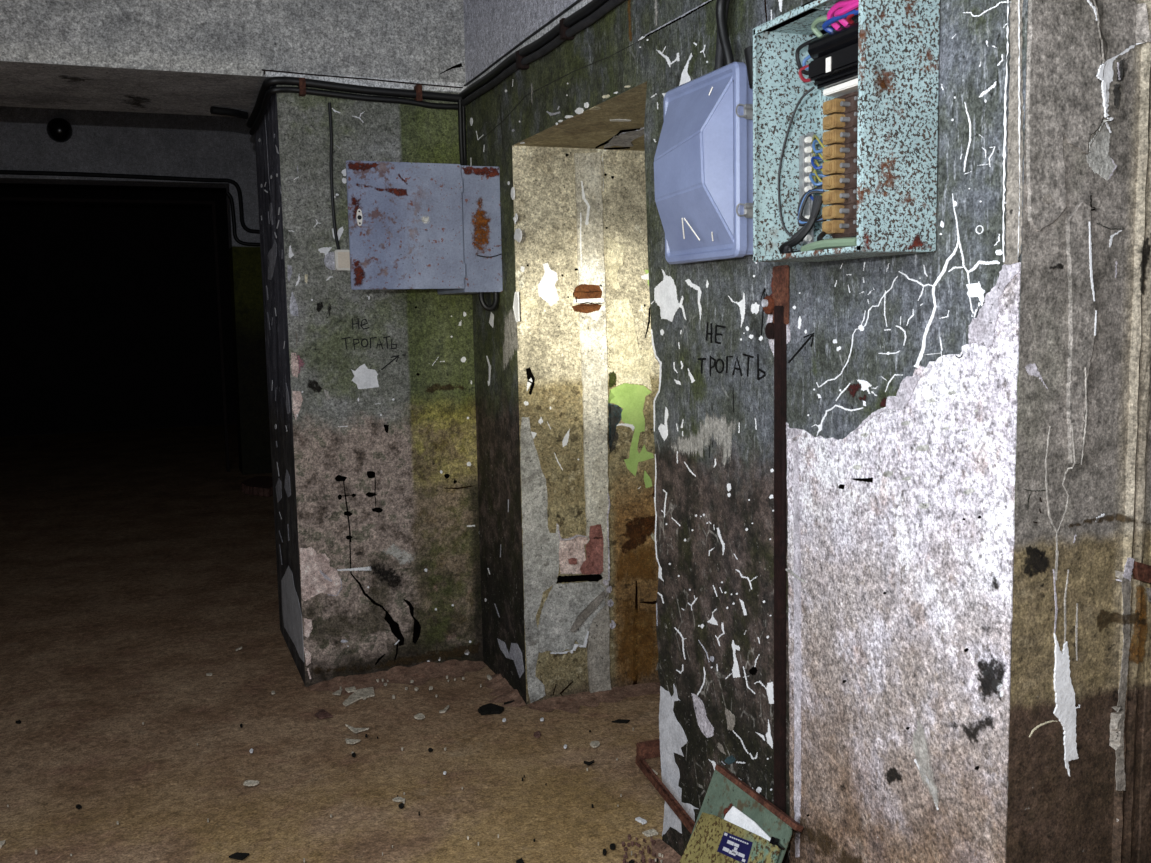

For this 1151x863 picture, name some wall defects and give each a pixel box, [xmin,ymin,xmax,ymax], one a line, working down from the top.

peeling [508,181,522,243]
crack [813,102,1000,436]
crack [335,471,421,665]
spalling [497,367,616,703]
peeling [513,181,756,626]
peeling [659,581,774,836]
spalling [770,0,1048,863]
spalling [1053,633,1080,776]
peeling [1109,557,1135,791]